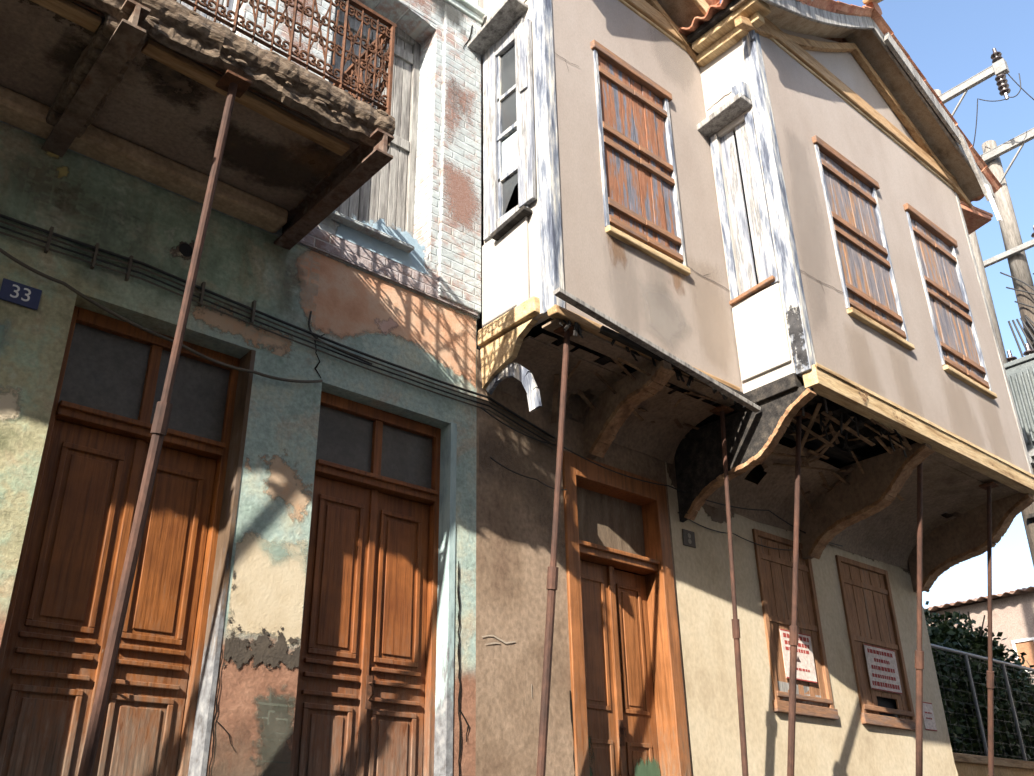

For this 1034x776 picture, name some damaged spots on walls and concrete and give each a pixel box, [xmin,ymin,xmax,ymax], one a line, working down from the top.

flaking render [445,74,476,145]
leakage [199,122,330,191]
flaking render [443,158,482,237]
peeling [191,302,293,356]
peeling [296,250,476,388]
peeling [245,449,313,521]
peeling [222,532,308,670]
crack [457,561,469,776]